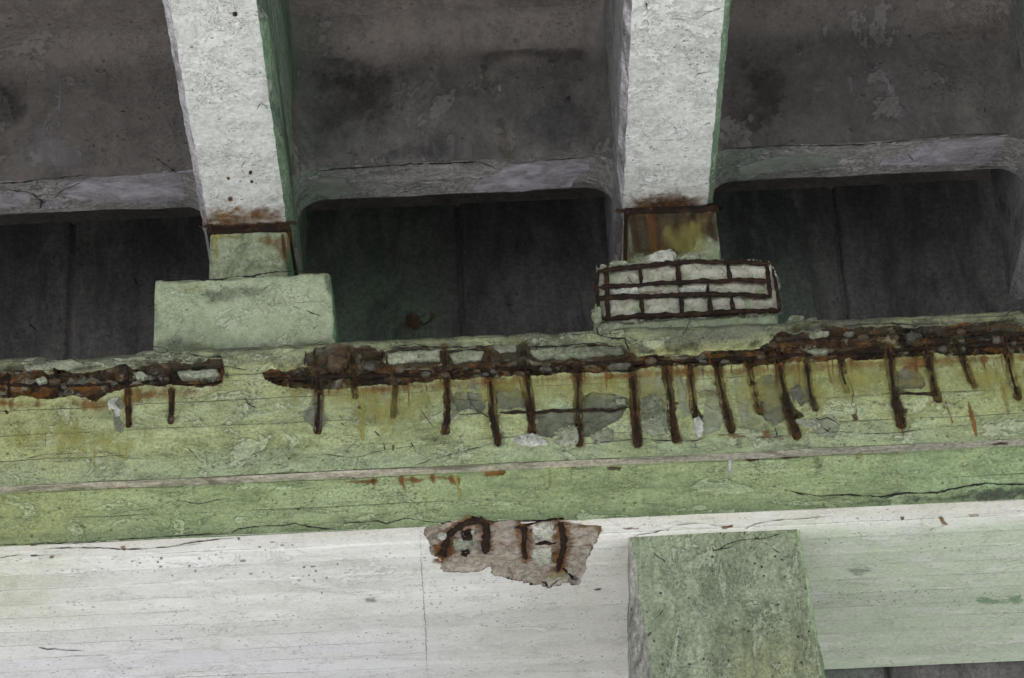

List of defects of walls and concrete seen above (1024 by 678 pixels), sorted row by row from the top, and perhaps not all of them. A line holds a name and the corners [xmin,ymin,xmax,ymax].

rust [198,196,297,270]
rust [615,194,722,255]
spalling [0,358,228,432]
spalling [263,320,1024,448]
rust [968,402,977,436]
spalling [423,516,602,588]
crack [627,482,1024,561]
crack [2,518,444,678]